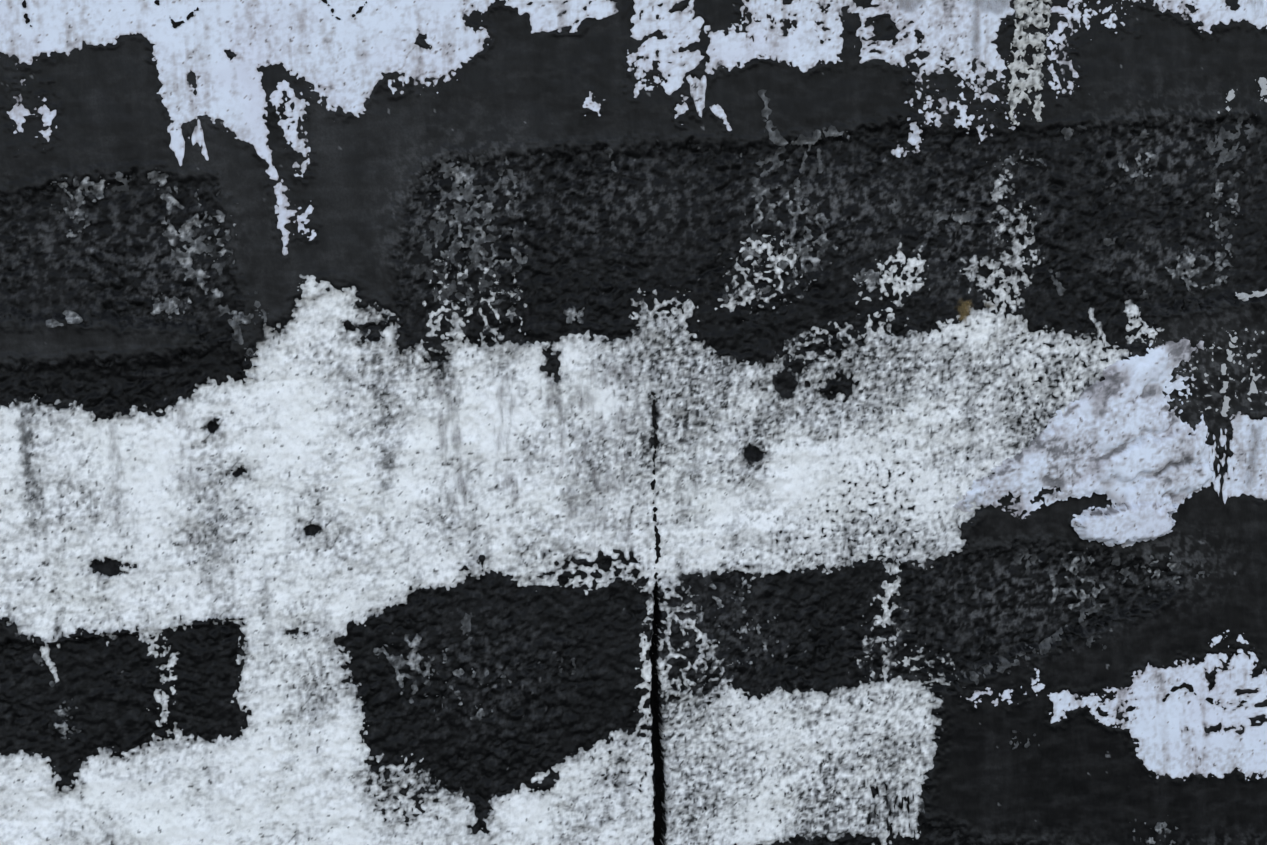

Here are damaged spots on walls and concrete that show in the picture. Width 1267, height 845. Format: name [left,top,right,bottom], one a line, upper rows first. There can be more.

peeling [626,0,1015,119]
peeling [1046,0,1267,99]
peeling [0,0,618,255]
peeling [710,104,732,131]
peeling [918,94,942,127]
crack [649,392,665,845]
peeling [960,687,1013,708]
peeling [1030,668,1045,696]
peeling [1047,630,1267,781]